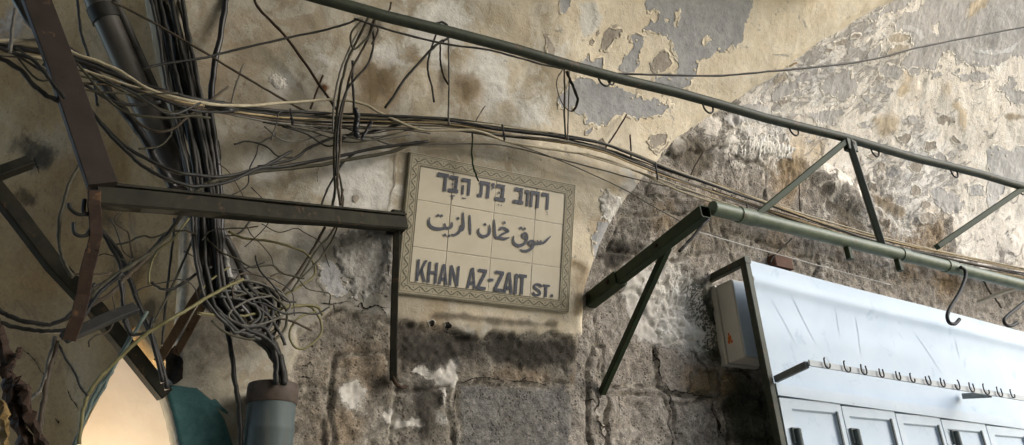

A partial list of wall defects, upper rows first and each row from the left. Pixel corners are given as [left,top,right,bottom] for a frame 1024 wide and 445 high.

flaking render [556,0,753,147]
flaking render [724,0,1024,128]
flaking render [896,114,920,144]
flaking render [937,112,968,151]
flaking render [866,139,1024,225]
leakage [435,313,557,326]
leakage [382,356,458,445]
crack [653,350,726,441]